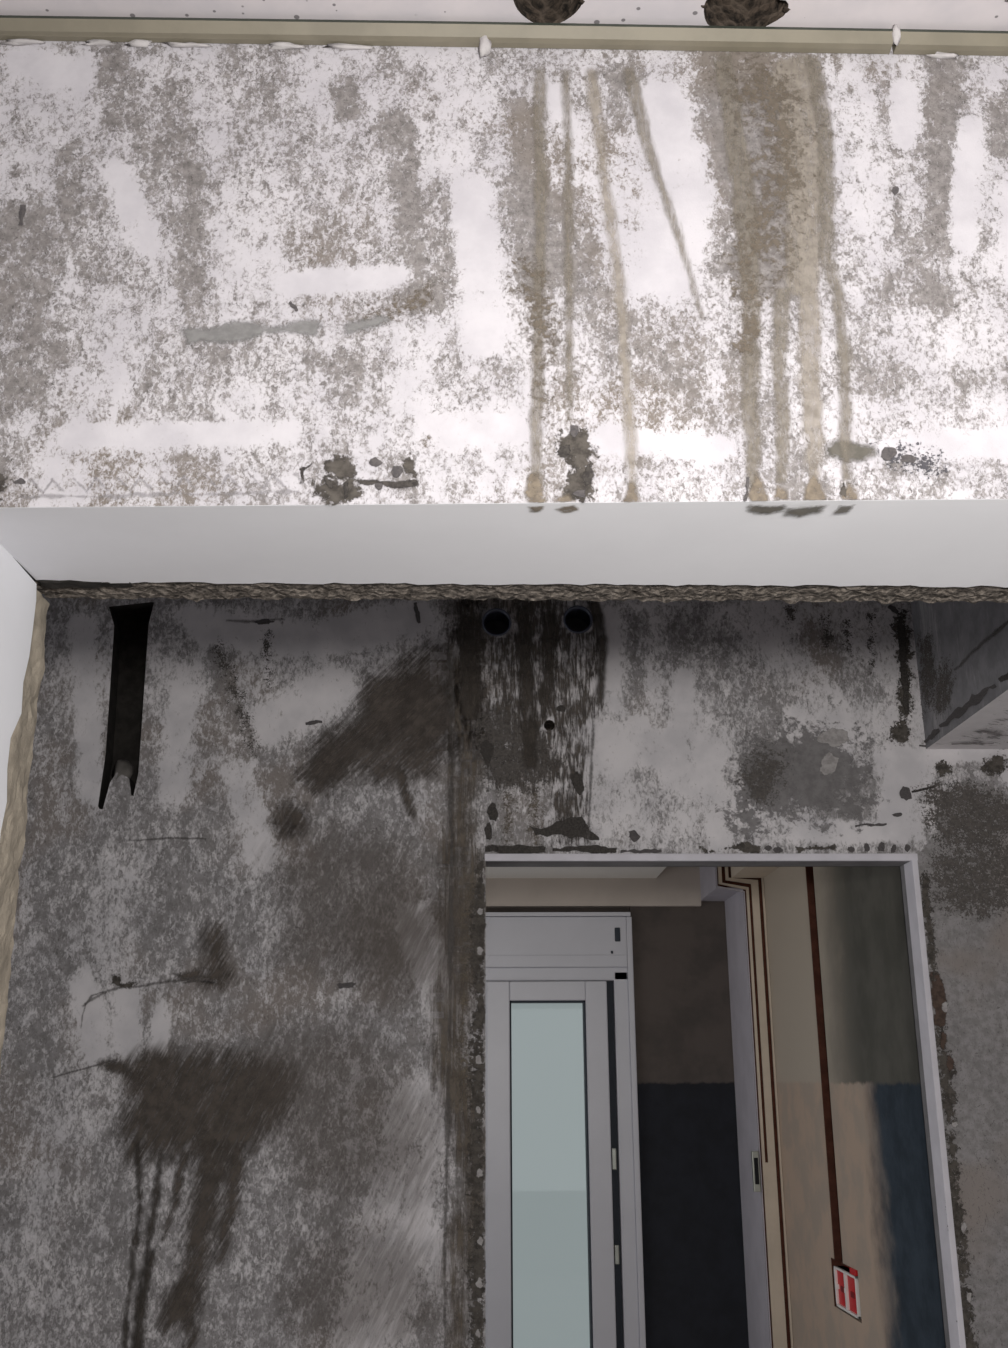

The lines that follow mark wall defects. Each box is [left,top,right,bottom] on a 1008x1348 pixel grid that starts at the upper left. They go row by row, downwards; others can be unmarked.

flaking render [0,473,26,501]
flaking render [299,435,434,506]
water stain [507,71,578,513]
flaking render [554,419,600,503]
water stain [588,70,639,502]
water stain [625,53,950,517]
water stain [99,1044,297,1348]
water stain [178,921,233,989]
water stain [272,598,607,1348]
spalling [0,577,1008,1072]
peeling [699,717,1008,1348]